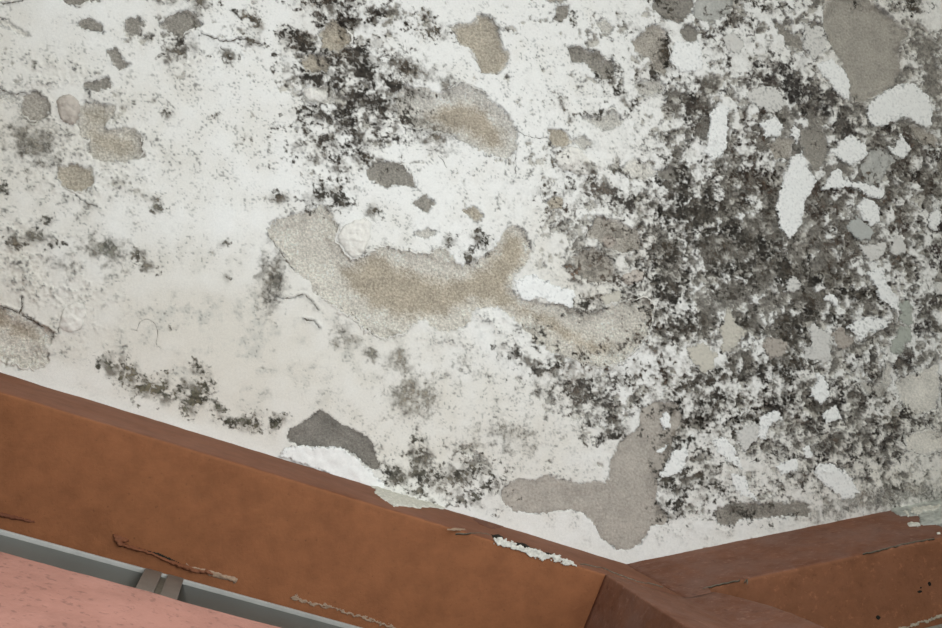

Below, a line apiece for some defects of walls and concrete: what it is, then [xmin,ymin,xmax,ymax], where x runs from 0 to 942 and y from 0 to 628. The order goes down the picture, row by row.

water stain [146,35,188,61]
spalling [449,15,510,75]
water stain [188,0,460,221]
spalling [746,0,942,310]
spalling [267,204,656,369]
water stain [443,228,494,265]
water stain [482,0,942,529]
water stain [95,352,288,435]
peeling [803,316,891,424]
spalling [278,409,445,510]
water stain [370,423,522,508]
spalling [501,401,689,550]